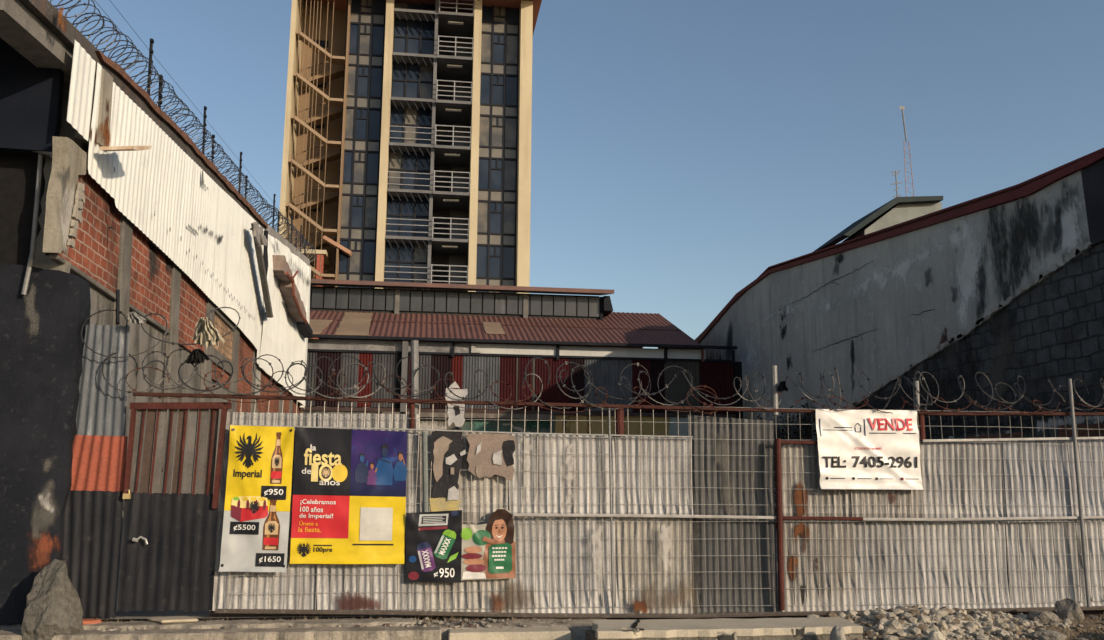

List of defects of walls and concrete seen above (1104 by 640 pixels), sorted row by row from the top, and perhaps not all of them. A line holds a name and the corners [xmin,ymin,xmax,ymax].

corrosion [90,101,111,146]
spalling [60,168,85,252]
crack [788,261,873,305]
crack [812,329,876,352]
damp [847,183,1104,439]
damp [706,327,813,456]
corrosion [788,482,809,581]